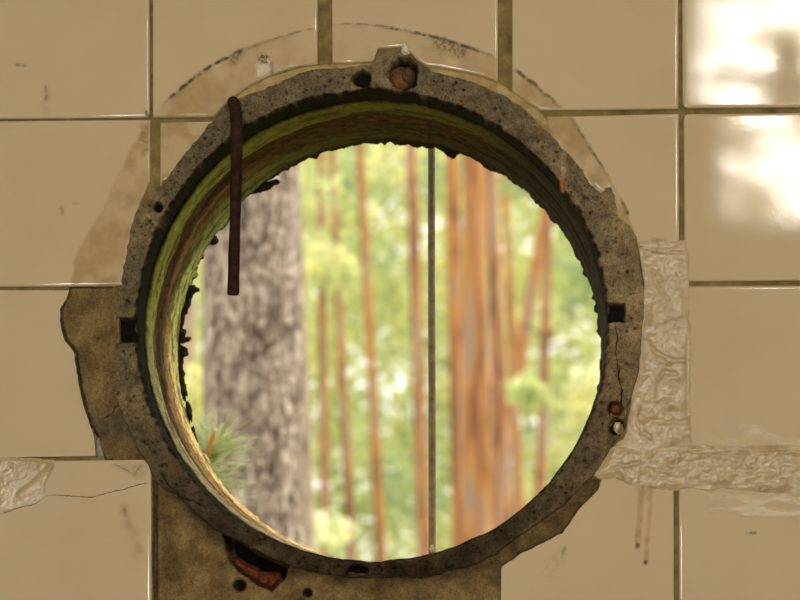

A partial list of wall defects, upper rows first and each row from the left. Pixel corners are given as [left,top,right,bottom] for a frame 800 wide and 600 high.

peeling [255,55,272,77]
peeling [252,179,280,194]
spalling [60,286,144,460]
peeling [178,285,200,443]
crack [615,325,625,409]
crack [0,472,211,524]
spalling [152,479,600,600]